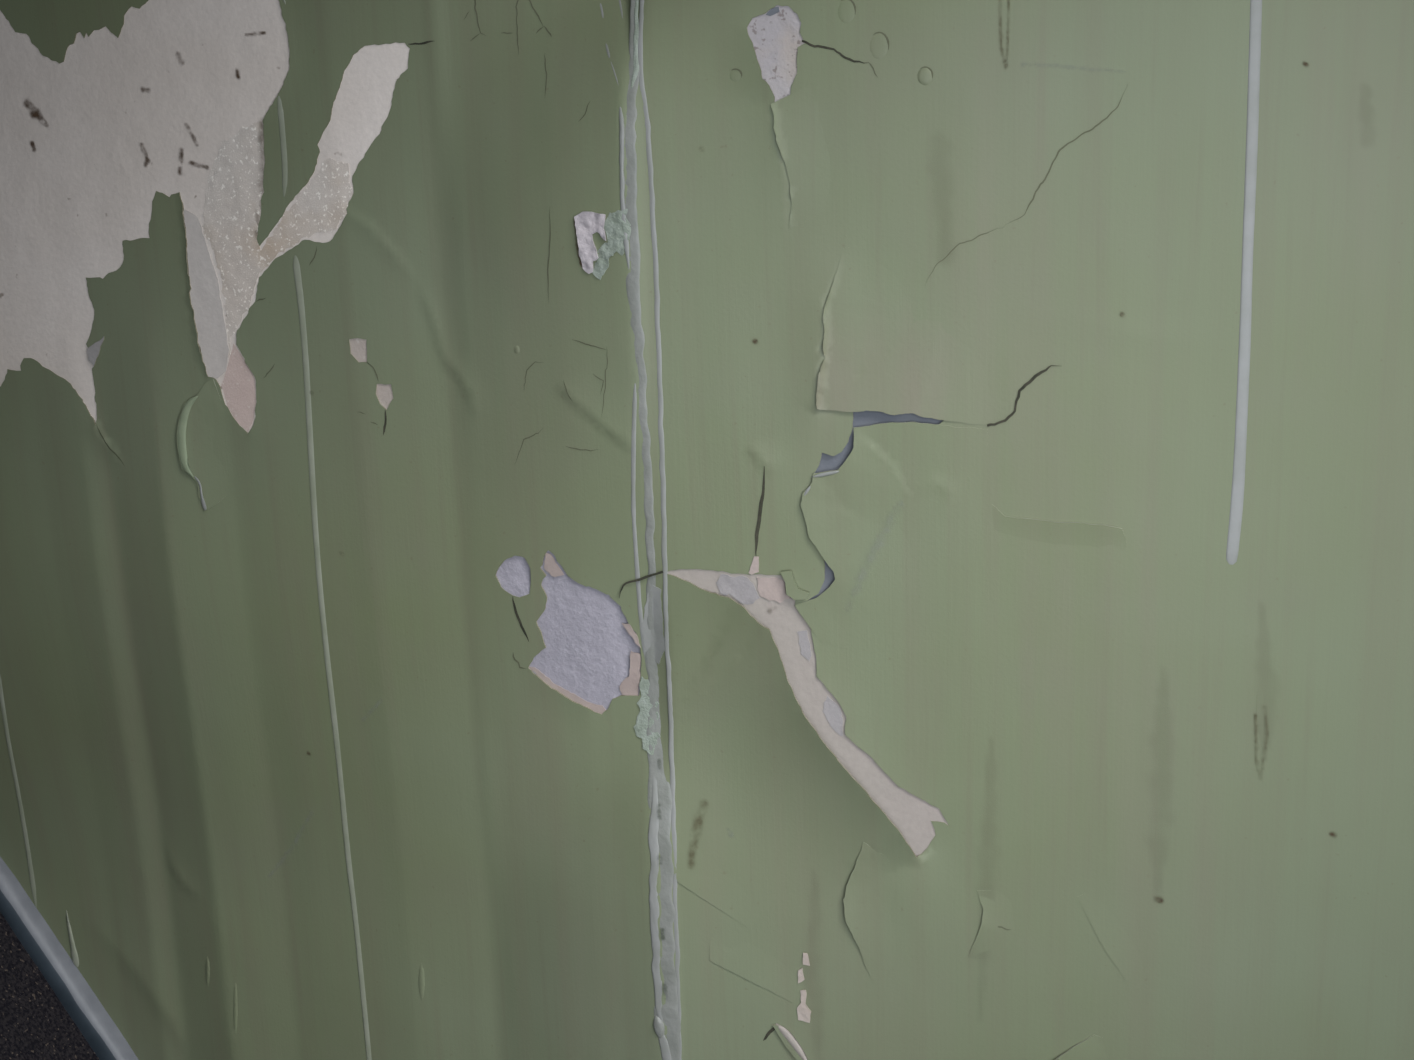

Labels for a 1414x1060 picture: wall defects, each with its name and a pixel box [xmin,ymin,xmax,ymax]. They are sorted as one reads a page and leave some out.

peeling [0,0,410,511]
peeling [574,209,631,280]
peeling [747,5,831,229]
peeling [812,240,1006,478]
crack [987,365,1056,427]
crack [925,87,1127,285]
spalling [496,550,641,714]
peeling [668,560,948,856]